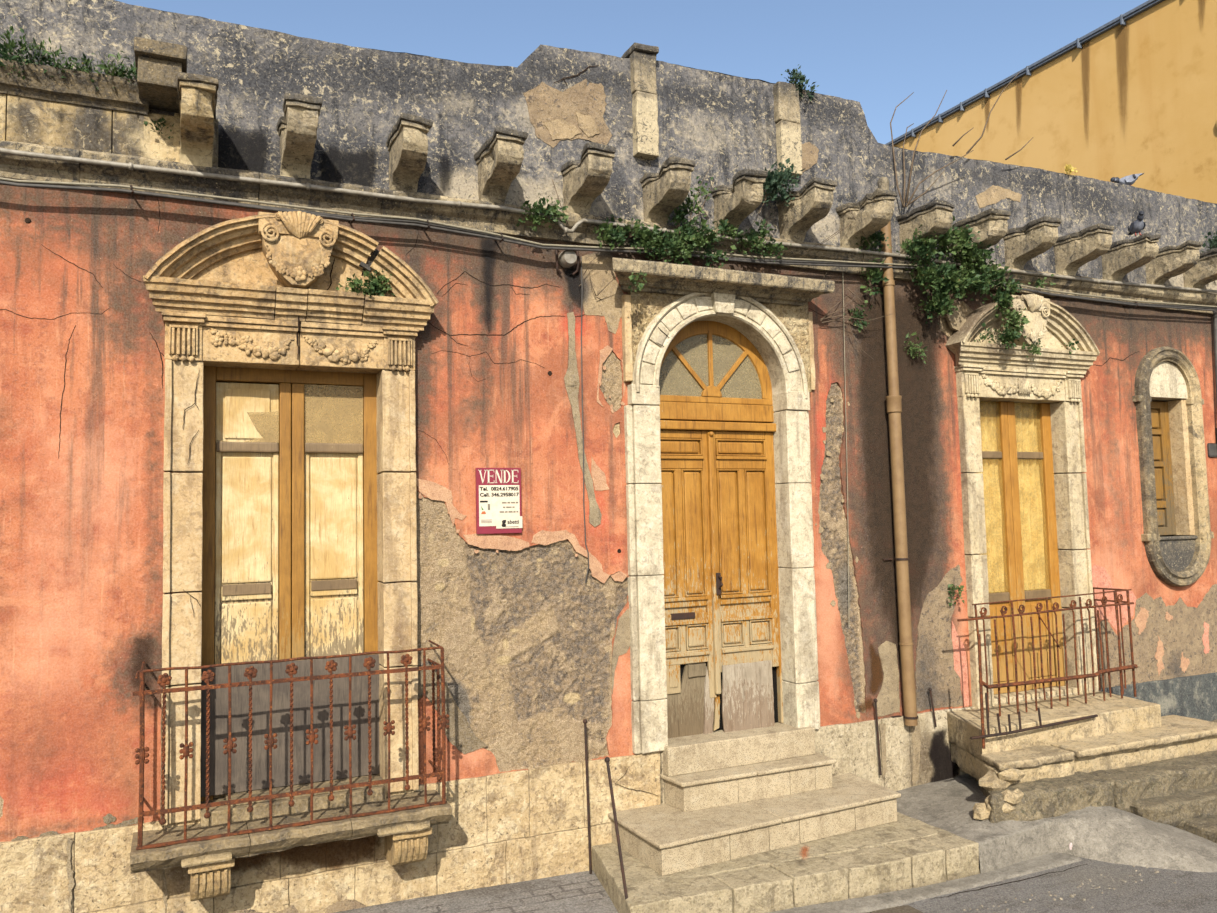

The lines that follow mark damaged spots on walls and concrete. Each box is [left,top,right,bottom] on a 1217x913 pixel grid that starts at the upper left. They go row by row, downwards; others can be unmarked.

spalling [523,78,612,148]
crack [0,244,141,459]
crack [427,271,606,382]
flaking render [580,252,625,438]
flaking render [413,478,630,772]
peeling [591,457,609,491]
flaking render [815,382,866,719]
leakage [859,645,883,712]
leakage [861,295,933,641]
flaking render [1096,584,1217,689]